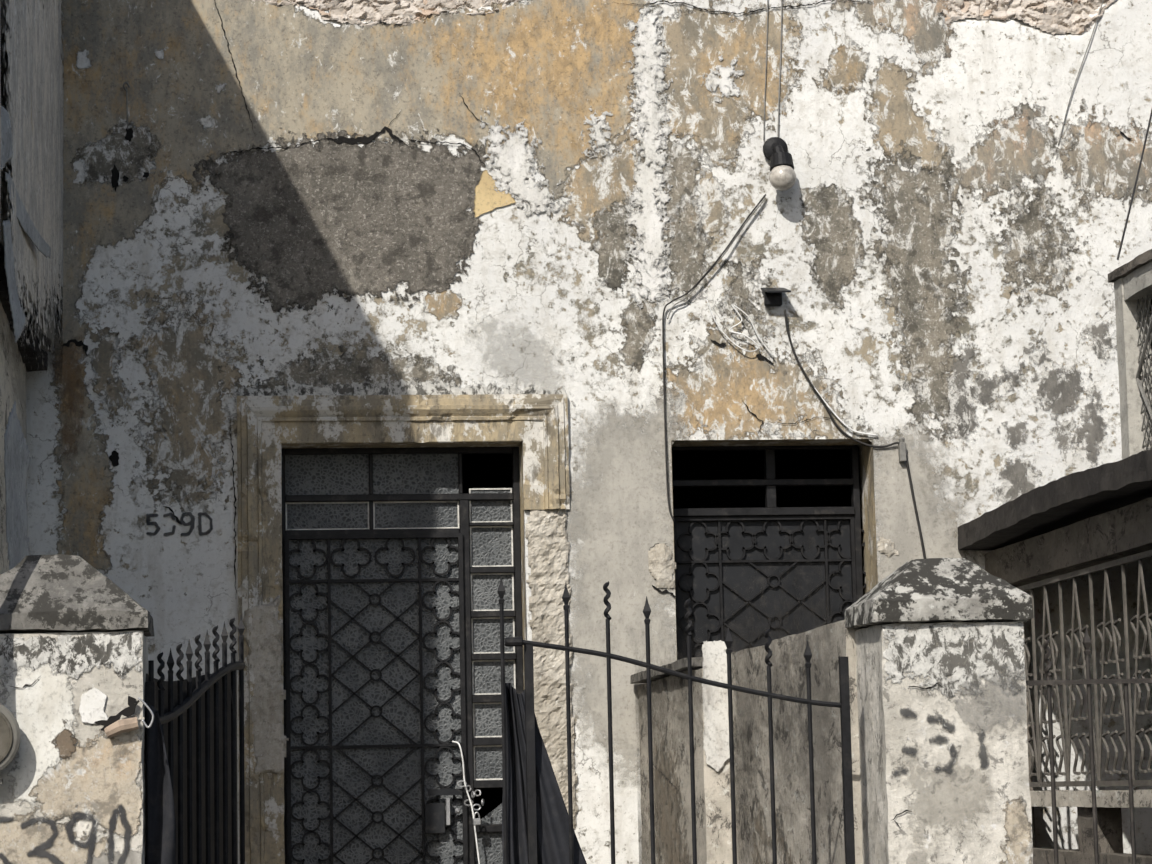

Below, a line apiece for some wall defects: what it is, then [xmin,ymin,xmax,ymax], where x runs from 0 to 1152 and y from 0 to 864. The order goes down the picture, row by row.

crack [214,0,494,165]
peeling [0,0,1152,574]
mould [945,312,1117,505]
peeling [0,661,144,864]
spalling [525,509,578,829]
peeling [999,793,1033,864]